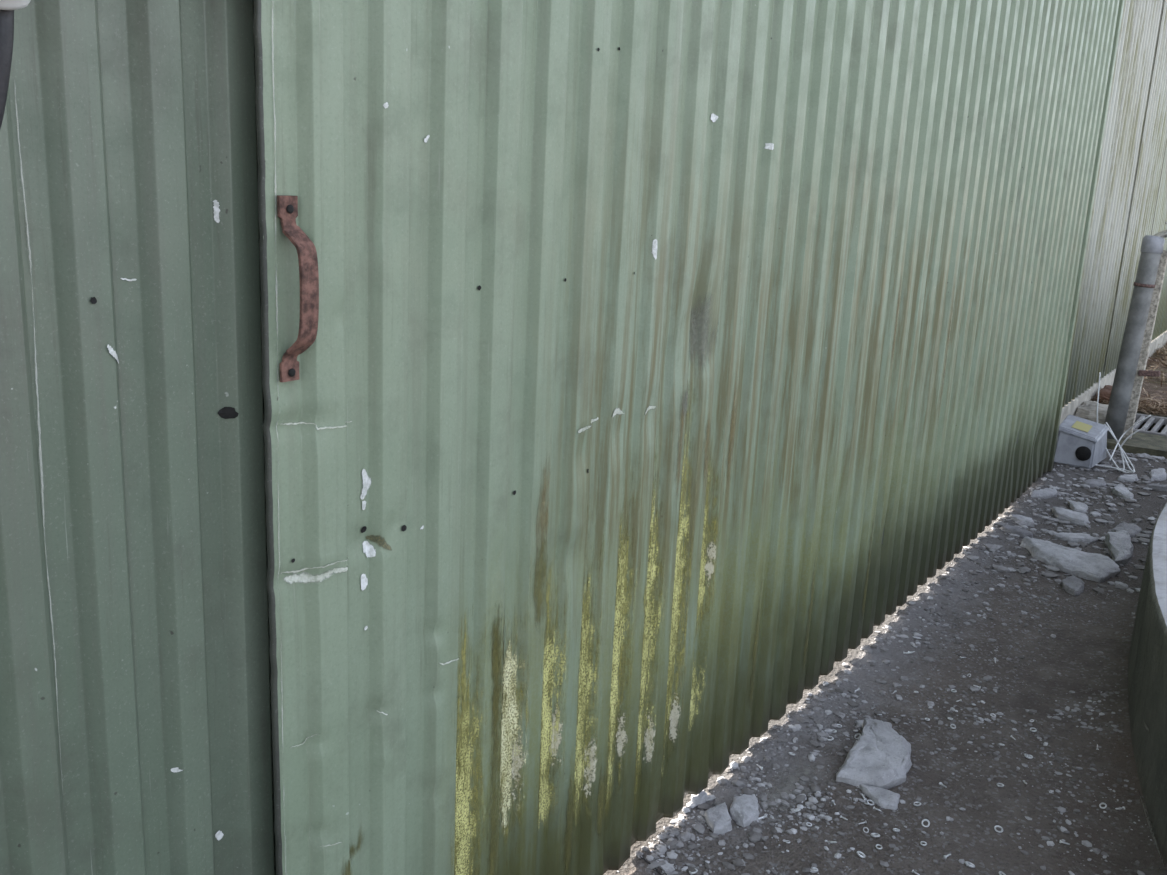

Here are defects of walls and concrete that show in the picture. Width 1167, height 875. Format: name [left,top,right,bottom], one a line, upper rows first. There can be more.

peeling [360,469,371,510]
peeling [363,541,376,557]
water stain [454,622,528,875]
water stain [534,546,566,823]
water stain [565,407,718,873]